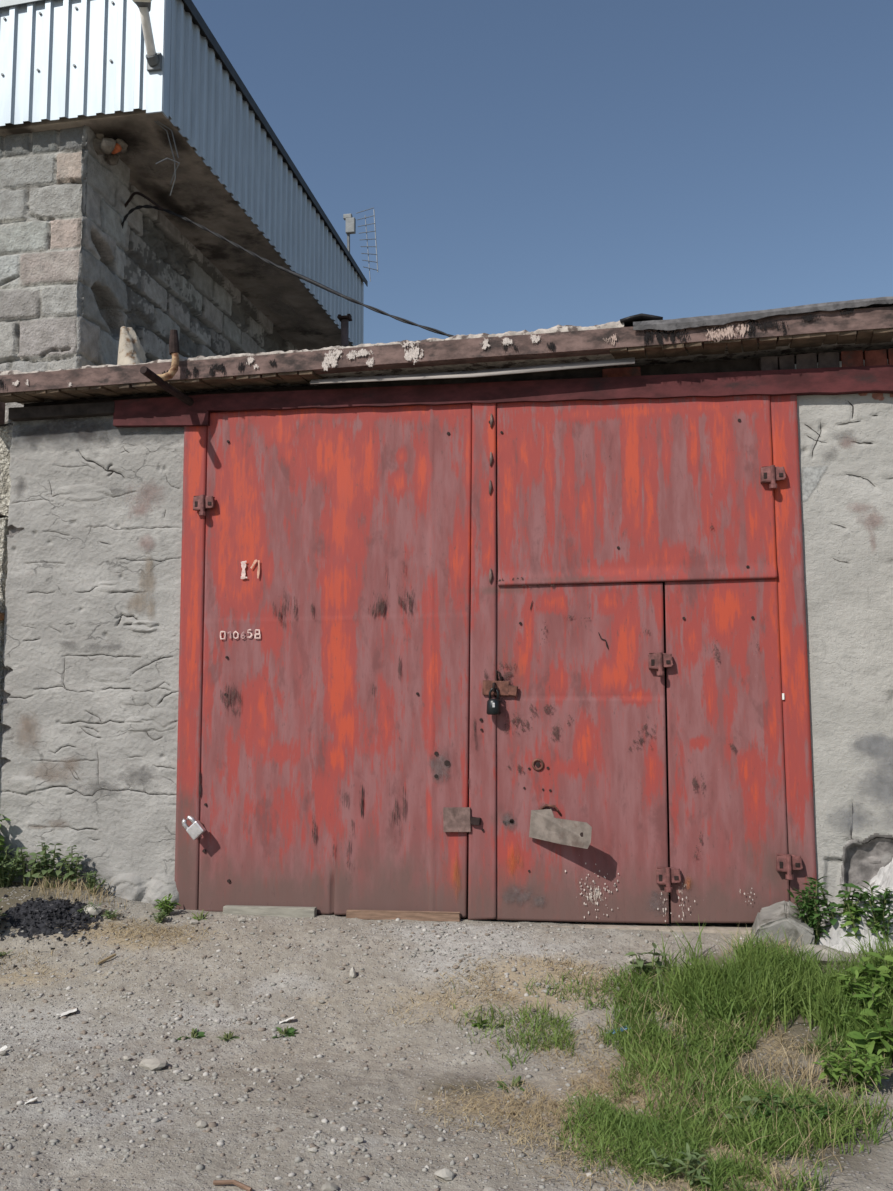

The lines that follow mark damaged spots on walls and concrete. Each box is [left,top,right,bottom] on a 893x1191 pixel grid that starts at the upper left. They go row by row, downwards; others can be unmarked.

peeling [322,348,374,371]
peeling [402,340,423,365]
peeling [706,324,749,341]
crack [805,401,878,455]
crack [14,450,136,503]
crack [43,478,180,562]
crack [30,586,159,626]
crack [0,623,201,797]